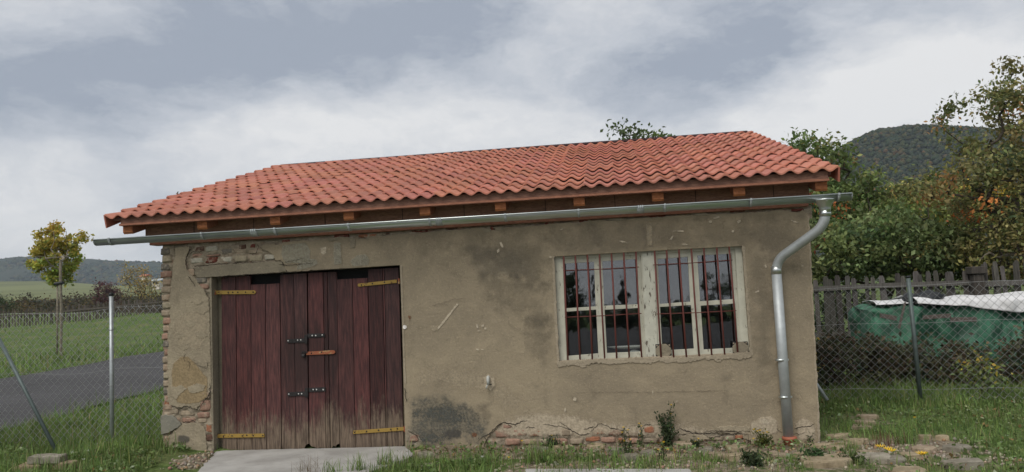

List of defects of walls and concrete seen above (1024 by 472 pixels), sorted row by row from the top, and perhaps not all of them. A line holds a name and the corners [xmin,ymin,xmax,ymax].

spalling [161,205,820,451]
damp [412,398,485,445]
crack [477,420,651,443]